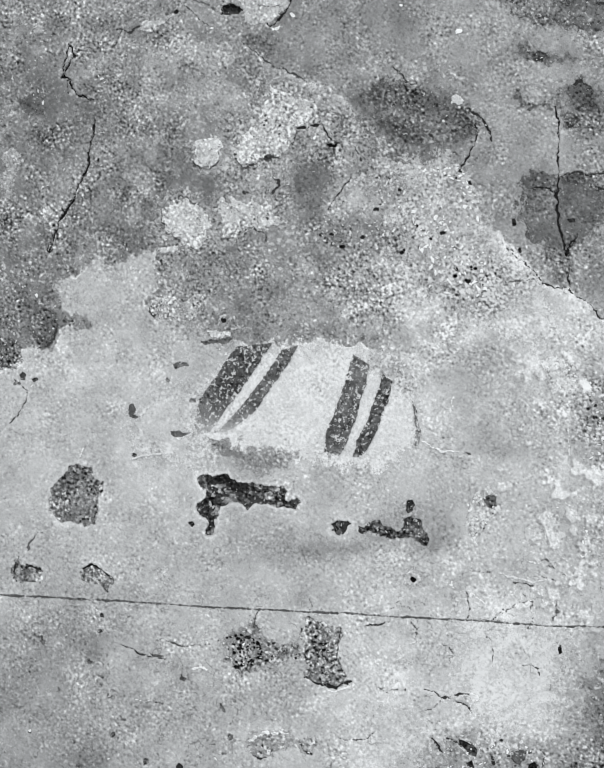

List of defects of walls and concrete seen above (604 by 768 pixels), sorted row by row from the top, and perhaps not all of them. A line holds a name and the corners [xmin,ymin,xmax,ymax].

damp [475,0,604,34]
crack [61,45,94,100]
damp [518,41,578,67]
crack [47,119,96,253]
crack [506,108,604,324]
damp [147,65,604,459]
damp [0,322,23,370]
spalling [48,462,104,530]
spalling [331,519,425,542]
spalling [11,556,43,584]
spalling [218,616,355,693]
crack [0,580,604,667]